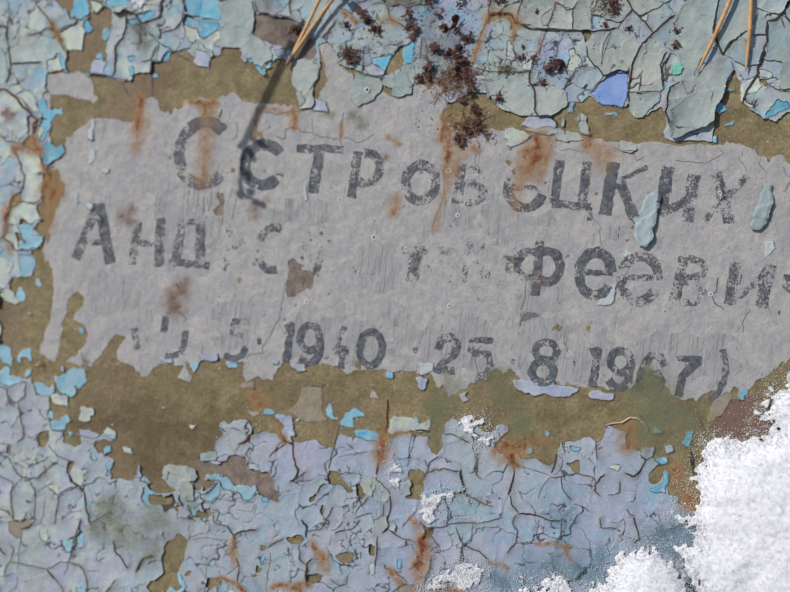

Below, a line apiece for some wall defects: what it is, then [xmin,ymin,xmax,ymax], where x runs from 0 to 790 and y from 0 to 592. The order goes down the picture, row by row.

peeling [16,0,328,171]
crack [474,0,679,127]
peeling [441,0,790,164]
crack [742,0,790,108]
corrosion [438,116,461,195]
corrosion [520,130,551,176]
peeling [0,116,790,518]
crack [0,381,153,592]
peeling [147,533,191,592]
corrosion [373,434,390,464]
corrosion [408,517,431,586]
crack [266,419,677,592]